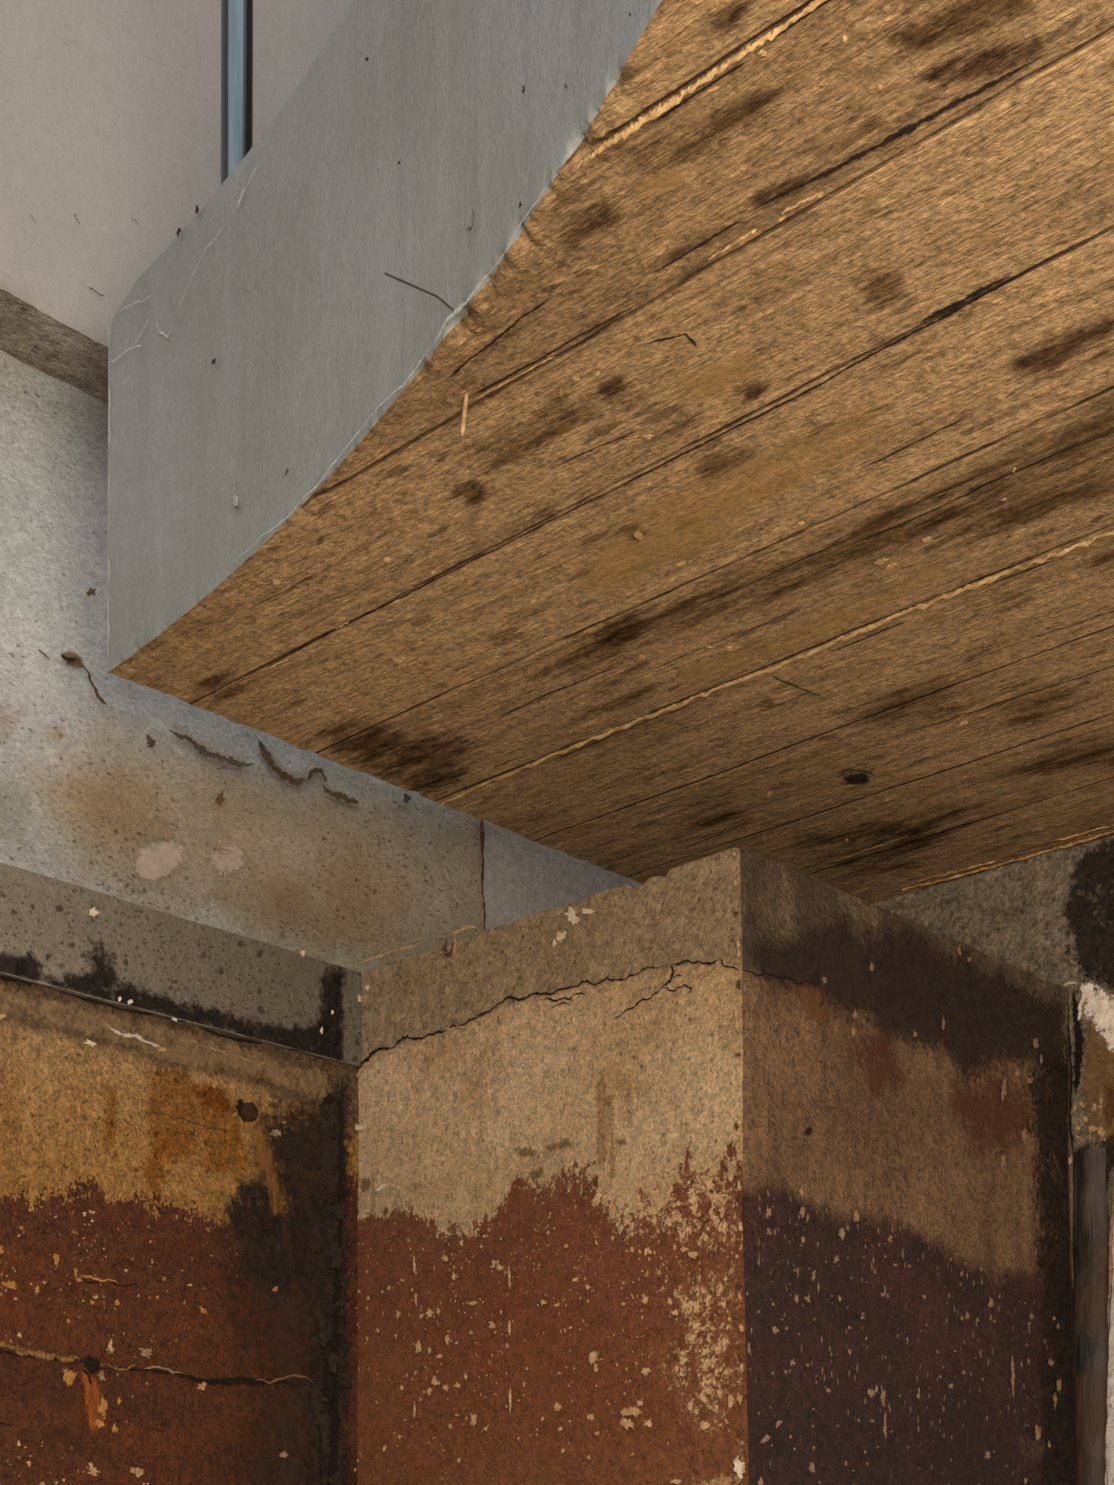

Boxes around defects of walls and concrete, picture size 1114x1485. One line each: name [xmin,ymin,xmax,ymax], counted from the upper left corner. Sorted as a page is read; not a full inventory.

spalling [61,651,82,667]
peeling [136,821,184,881]
damp [1064,838,1114,988]
peeling [0,1248,50,1301]
peeling [49,1210,120,1305]
rust [253,1125,282,1214]
crack [0,959,824,1485]
damp [753,916,1114,1485]
rust [63,1367,121,1433]